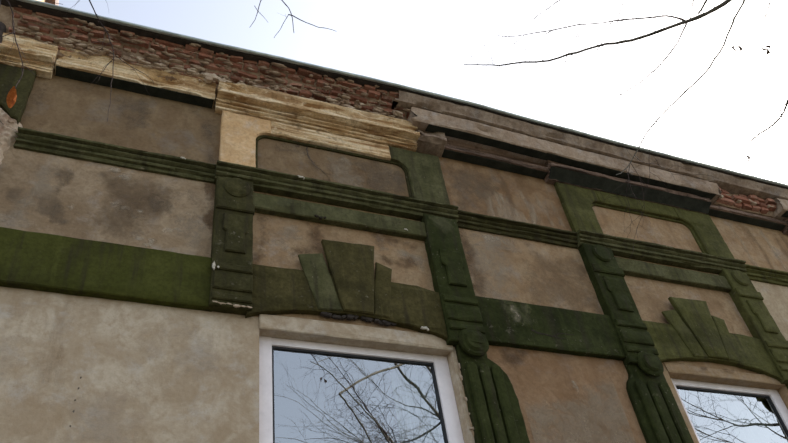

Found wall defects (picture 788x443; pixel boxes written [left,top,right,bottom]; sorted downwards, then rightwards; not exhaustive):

spalling [9,5,411,119]
spalling [0,108,23,164]
spalling [712,187,777,218]